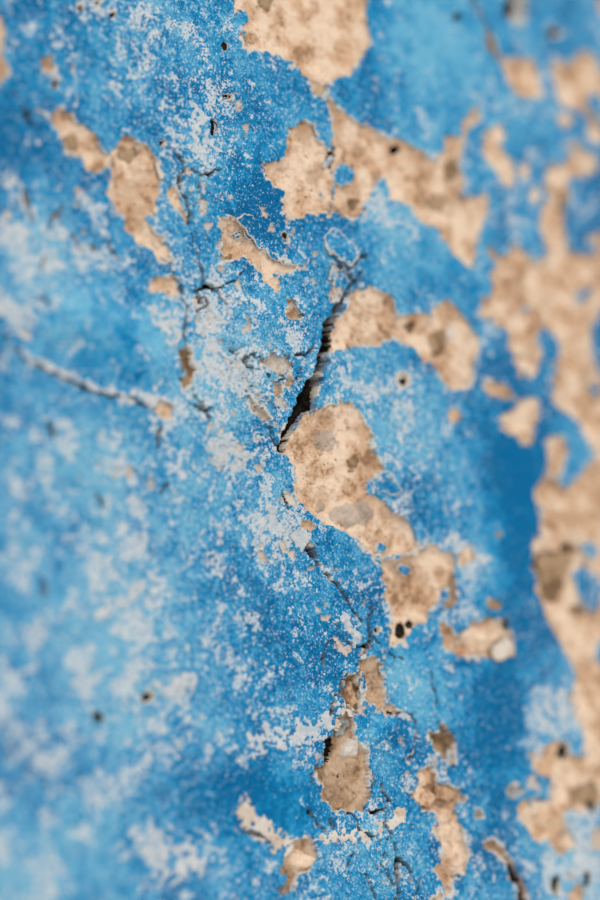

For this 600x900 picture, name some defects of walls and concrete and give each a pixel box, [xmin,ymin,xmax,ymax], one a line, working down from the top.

peeling [34,109,169,262]
crack [167,173,187,225]
peeling [233,0,487,267]
crack [194,281,231,306]
crack [275,228,362,453]
peeling [322,285,478,390]
peeling [280,401,474,644]
peeling [480,53,600,855]
crack [335,611,366,661]
peeling [439,599,516,662]
peeling [313,654,411,814]
peeling [412,767,468,900]